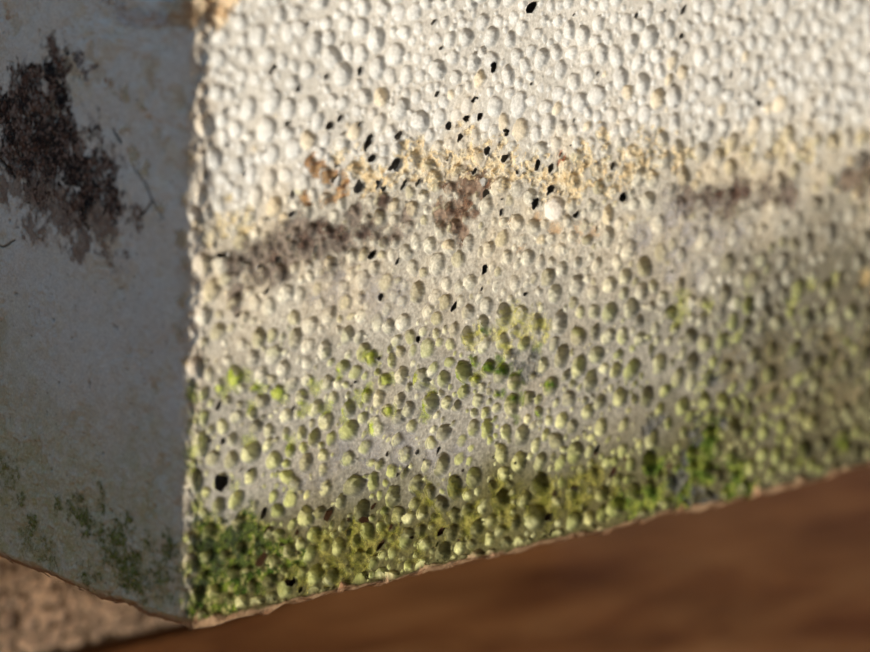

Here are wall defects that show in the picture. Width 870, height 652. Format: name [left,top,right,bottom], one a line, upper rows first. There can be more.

water stain [510,348,542,385]
water stain [668,414,718,505]